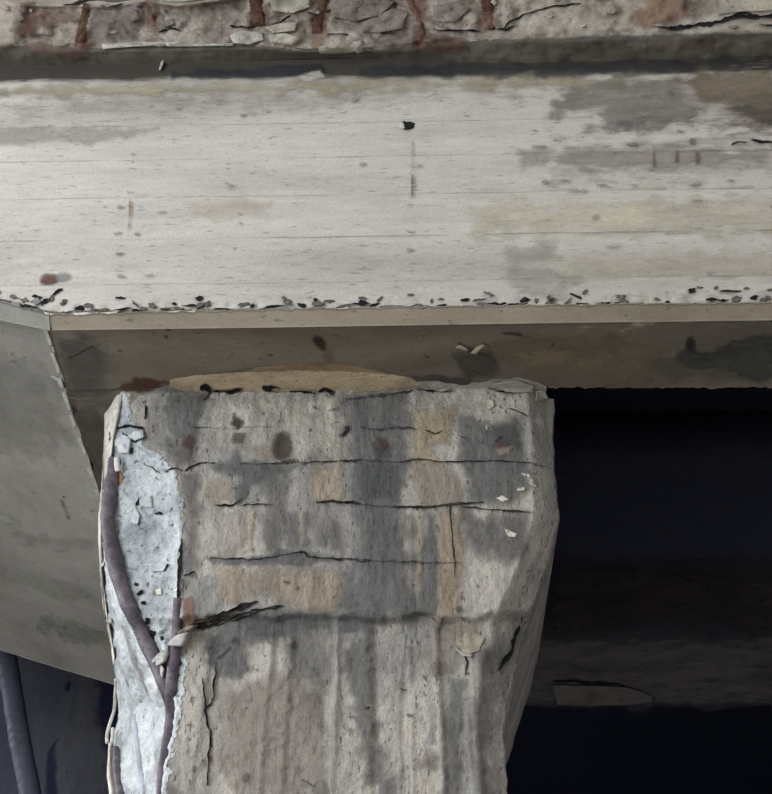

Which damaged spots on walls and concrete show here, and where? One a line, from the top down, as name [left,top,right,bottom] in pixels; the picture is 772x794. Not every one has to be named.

corrosion [17,0,158,59]
corrosion [186,0,268,28]
spalling [1,0,519,54]
corrosion [375,0,465,55]
spalling [717,0,772,14]
leakage [172,33,772,132]
leakage [496,336,772,385]
crack [210,499,529,575]
spalling [94,391,198,794]
crack [187,601,283,629]
leakage [165,389,529,794]
crack [202,648,229,783]